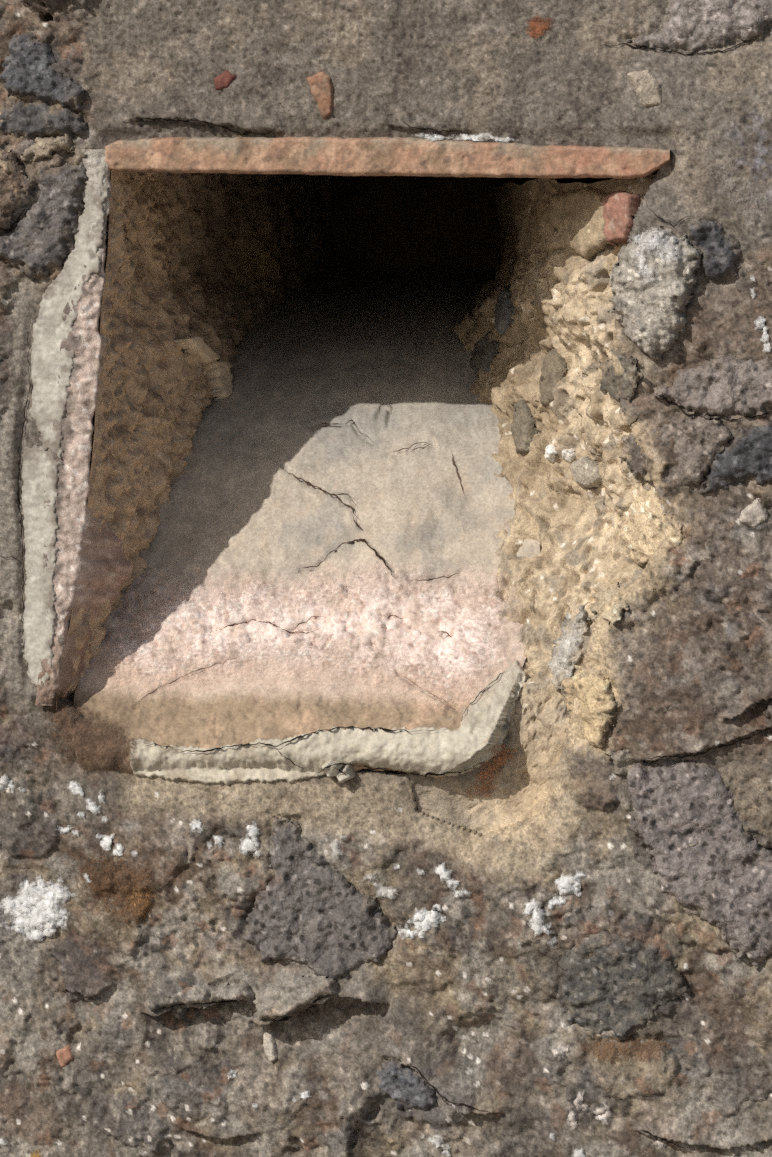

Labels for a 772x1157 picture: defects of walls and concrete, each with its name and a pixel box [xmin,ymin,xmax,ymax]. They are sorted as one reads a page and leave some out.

flaking render [19,162,112,686]
crack [315,403,464,493]
crack [284,469,457,581]
spalling [108,174,657,835]
crack [214,616,326,634]
crack [134,657,237,705]
crack [640,727,769,759]